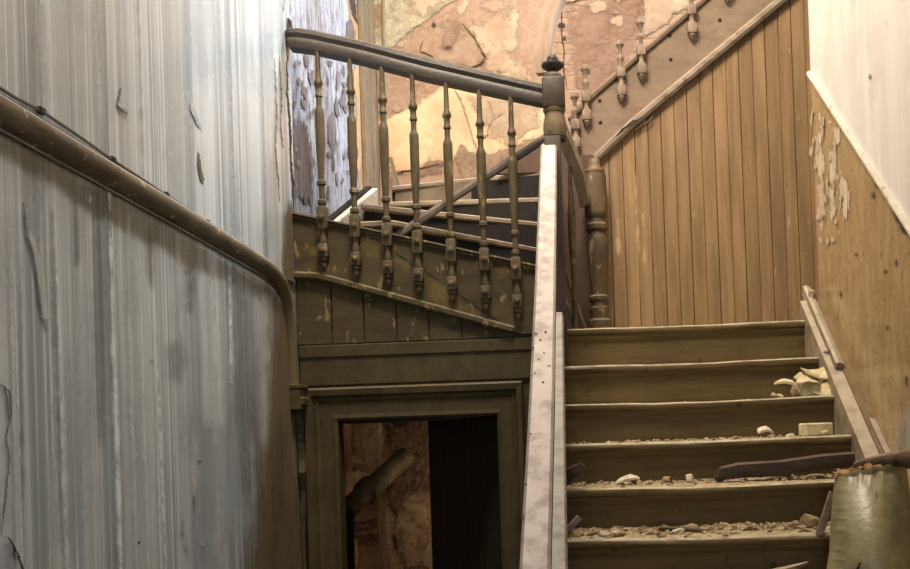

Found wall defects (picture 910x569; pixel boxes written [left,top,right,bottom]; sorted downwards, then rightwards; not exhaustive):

peeling [374,0,532,81]
spalling [558,0,689,93]
peeling [293,54,315,206]
peeling [326,60,363,199]
peeling [376,70,545,179]
peeling [809,108,851,245]
crack [0,384,24,569]